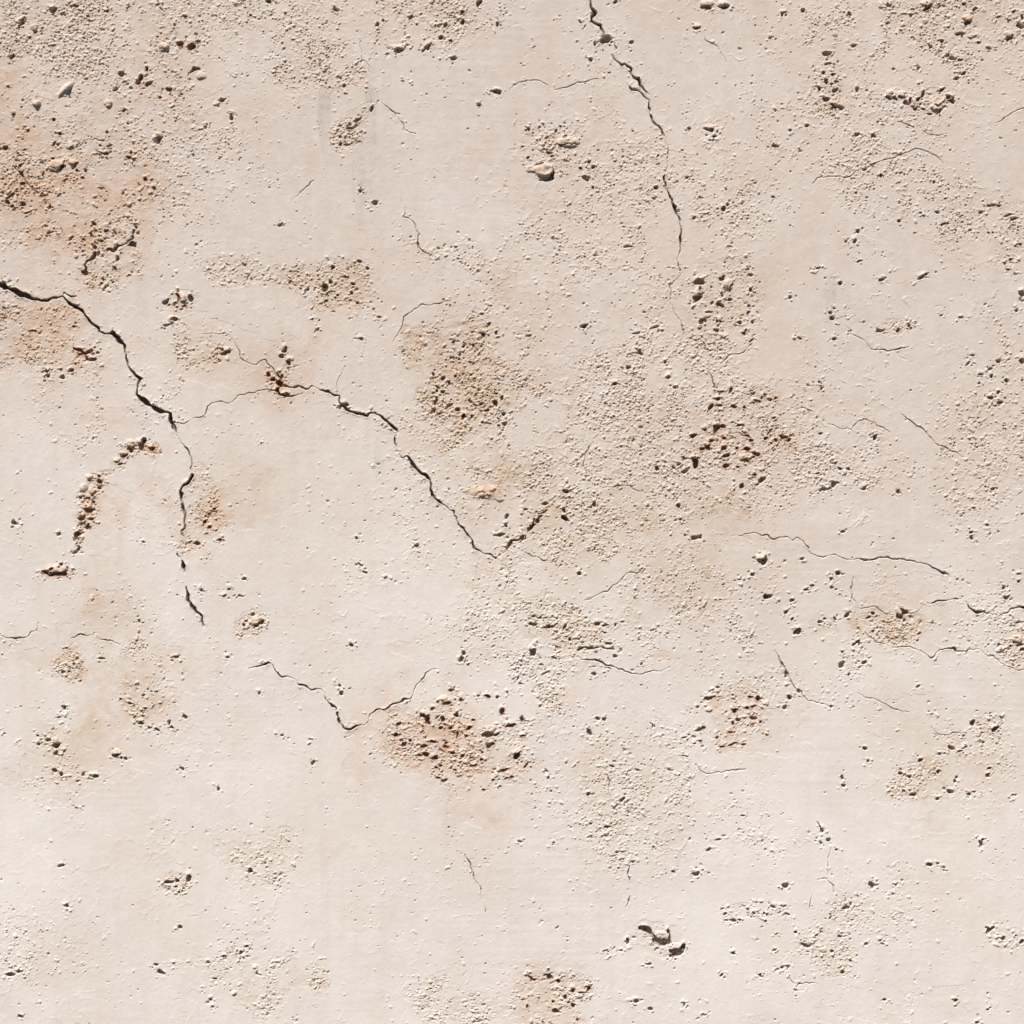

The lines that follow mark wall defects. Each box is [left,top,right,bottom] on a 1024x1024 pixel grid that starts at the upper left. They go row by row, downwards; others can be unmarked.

crack [509,0,756,426]
crack [0,282,552,631]
crack [249,661,436,731]
crack [738,532,1024,671]